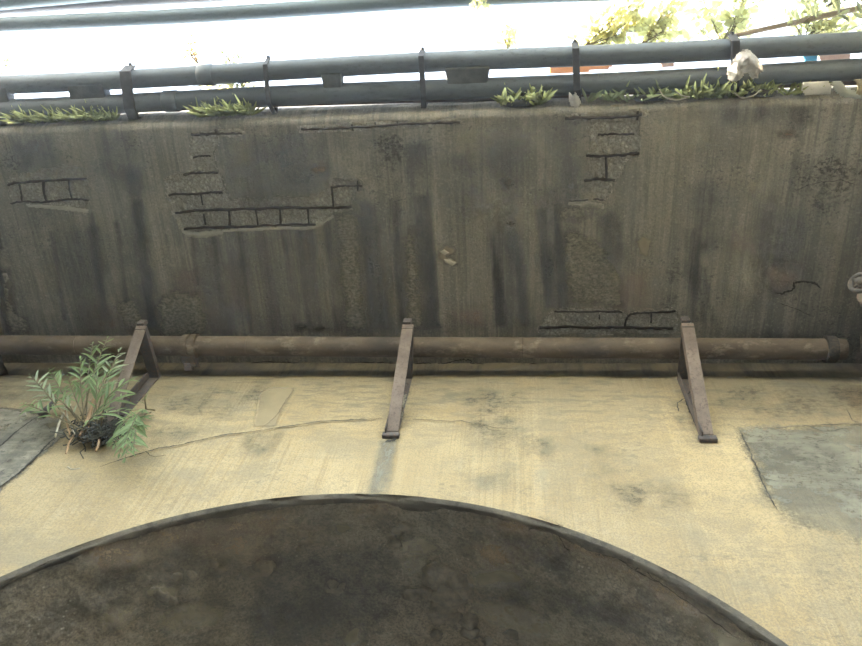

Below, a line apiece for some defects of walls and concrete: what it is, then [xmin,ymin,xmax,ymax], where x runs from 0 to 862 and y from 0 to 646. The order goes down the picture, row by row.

spalling [7,164,90,213]
spalling [163,128,365,238]
spalling [565,108,650,209]
spalling [537,306,680,335]
crack [0,408,60,487]
crack [100,390,379,467]